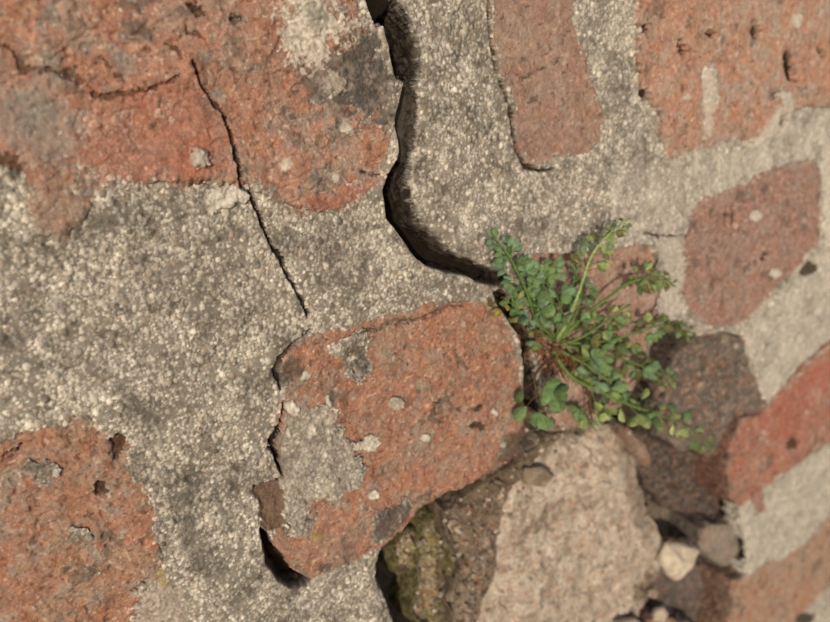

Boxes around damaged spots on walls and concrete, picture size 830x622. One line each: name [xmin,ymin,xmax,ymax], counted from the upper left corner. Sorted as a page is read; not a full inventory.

spalling [187,0,206,17]
spalling [51,54,238,205]
spalling [0,153,23,172]
spalling [294,168,390,221]
crack [354,0,537,409]
crack [0,26,311,483]
spalling [110,432,126,459]
spalling [94,480,108,495]
spalling [252,478,285,531]
crack [259,527,299,575]